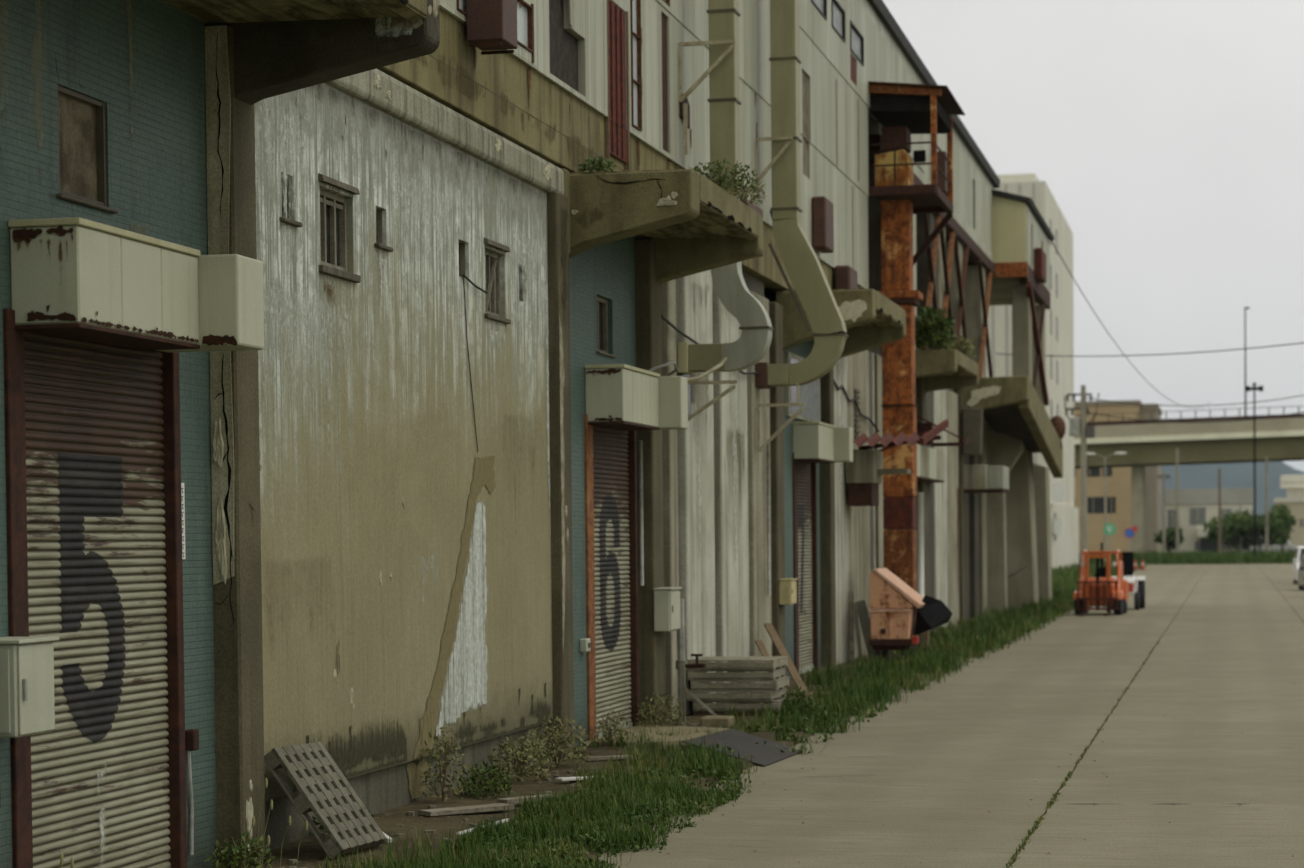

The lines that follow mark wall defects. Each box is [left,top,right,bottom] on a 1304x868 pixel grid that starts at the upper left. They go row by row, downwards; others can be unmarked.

crack [212,34,224,216]
leakage [256,100,305,233]
rust [12,225,73,261]
rust [27,305,237,346]
flaking render [838,299,901,324]
flaking render [967,385,1001,407]
peeling [414,456,495,760]
leakage [328,683,552,799]